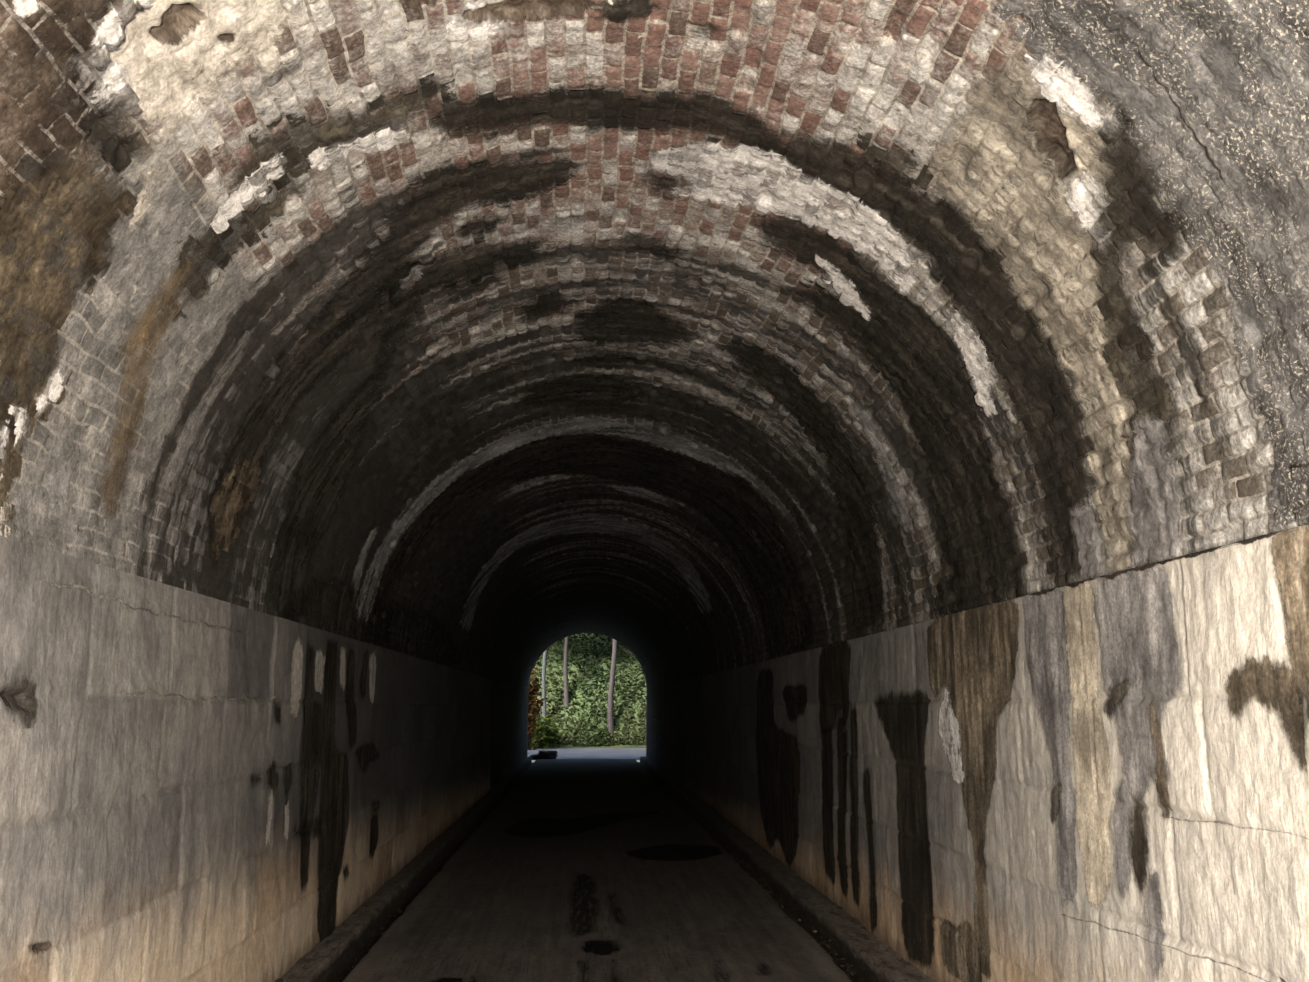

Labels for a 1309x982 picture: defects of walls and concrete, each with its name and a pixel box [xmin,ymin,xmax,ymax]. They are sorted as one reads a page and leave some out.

spalling [149,3,206,45]
spalling [399,0,437,10]
spalling [444,0,613,43]
leakage [0,159,156,538]
leakage [307,127,410,170]
leakage [651,142,917,293]
leakage [815,254,871,321]
leakage [874,48,1182,982]
crack [1288,463,1309,471]
leakage [1226,525,1309,771]
leakage [251,639,380,942]
leakage [756,640,877,932]